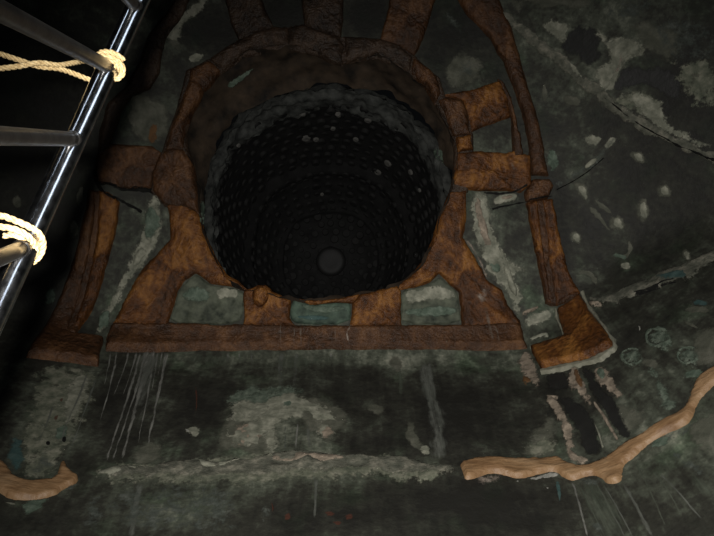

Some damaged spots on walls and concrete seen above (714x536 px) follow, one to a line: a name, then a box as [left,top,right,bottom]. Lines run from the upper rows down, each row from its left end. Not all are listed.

crack [605,98,714,161]
crack [92,170,151,213]
crack [484,158,604,210]
damp [104,353,168,457]
damp [421,365,445,457]